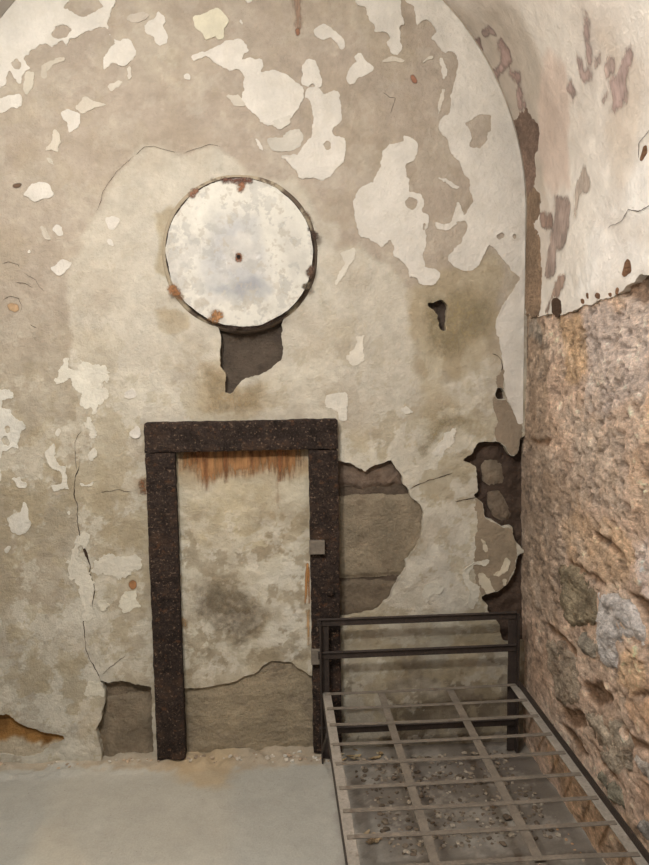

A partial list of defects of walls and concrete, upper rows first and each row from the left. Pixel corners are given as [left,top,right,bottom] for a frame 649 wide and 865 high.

peeling [0,0,136,113]
peeling [46,96,106,165]
peeling [191,8,346,181]
rust [165,177,318,331]
peeling [54,358,110,461]
rust [180,449,301,482]
spalling [220,322,283,394]
spalling [335,0,649,865]
crack [73,432,125,678]
peeling [66,532,142,622]
spalling [84,681,154,756]
spalling [185,661,313,753]